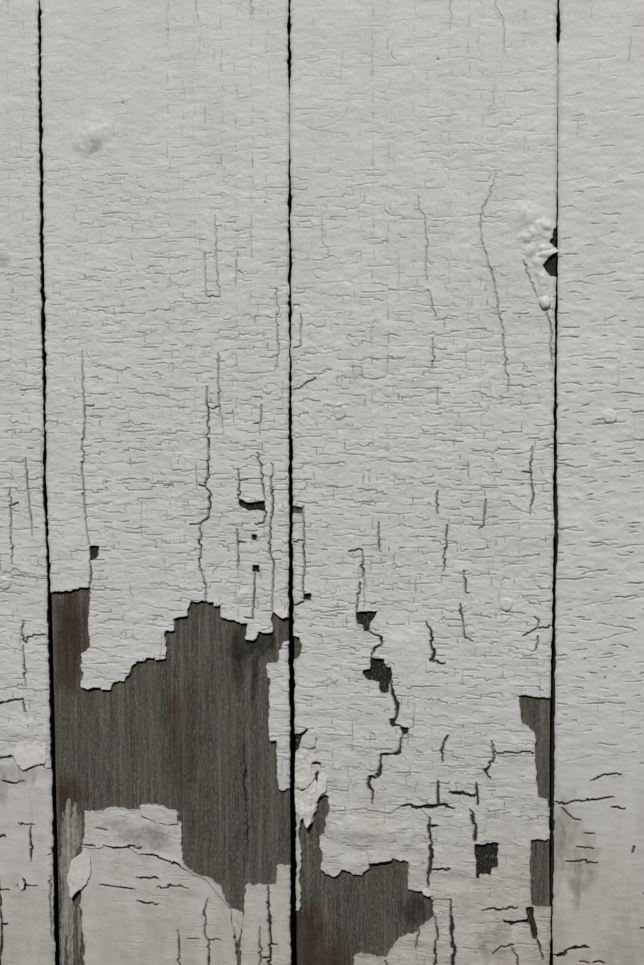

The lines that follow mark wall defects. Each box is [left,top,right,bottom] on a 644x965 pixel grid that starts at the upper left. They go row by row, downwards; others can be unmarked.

crack [193,386,221,586]
crack [237,456,306,619]
crack [427,625,443,664]
crack [85,828,186,905]
peeling [52,587,434,965]
crack [367,678,403,800]
crack [402,736,496,887]
peeling [475,842,499,878]
peeling [519,695,550,806]
crack [553,773,622,864]
crack [259,886,276,965]
crack [416,901,456,965]